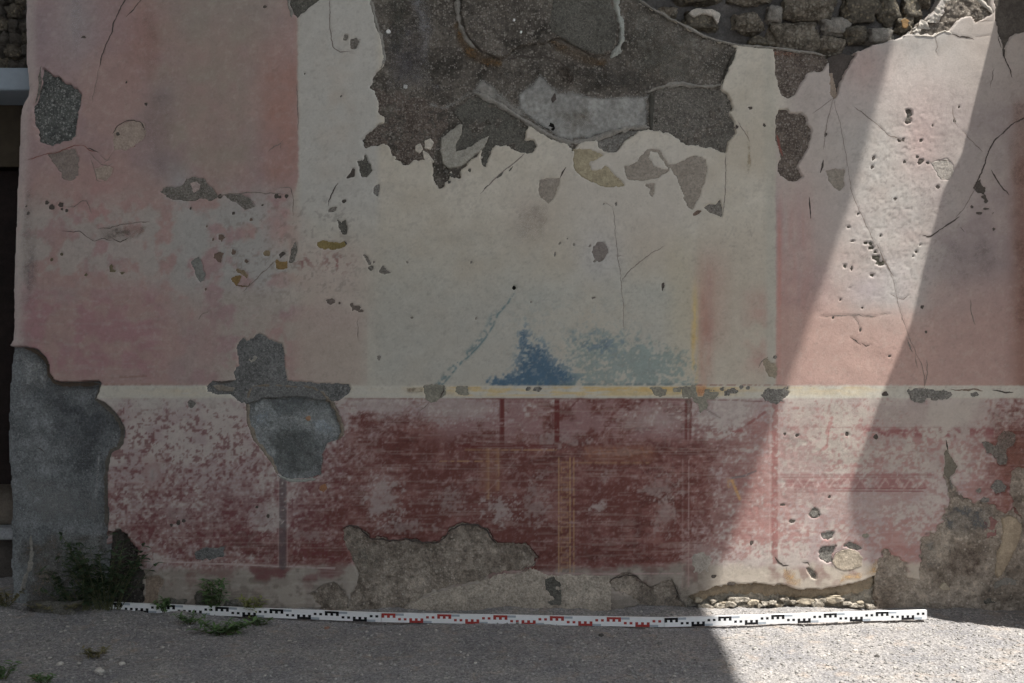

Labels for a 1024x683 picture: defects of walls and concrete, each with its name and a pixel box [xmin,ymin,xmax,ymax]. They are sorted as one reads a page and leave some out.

spalling [32,67,97,181]
peeling [160,177,289,221]
peeling [347,0,854,217]
crack [815,98,928,388]
crack [923,109,1024,237]
spalling [110,529,145,603]
spalling [310,522,538,611]
spalling [803,533,869,579]
spalling [872,431,1024,611]